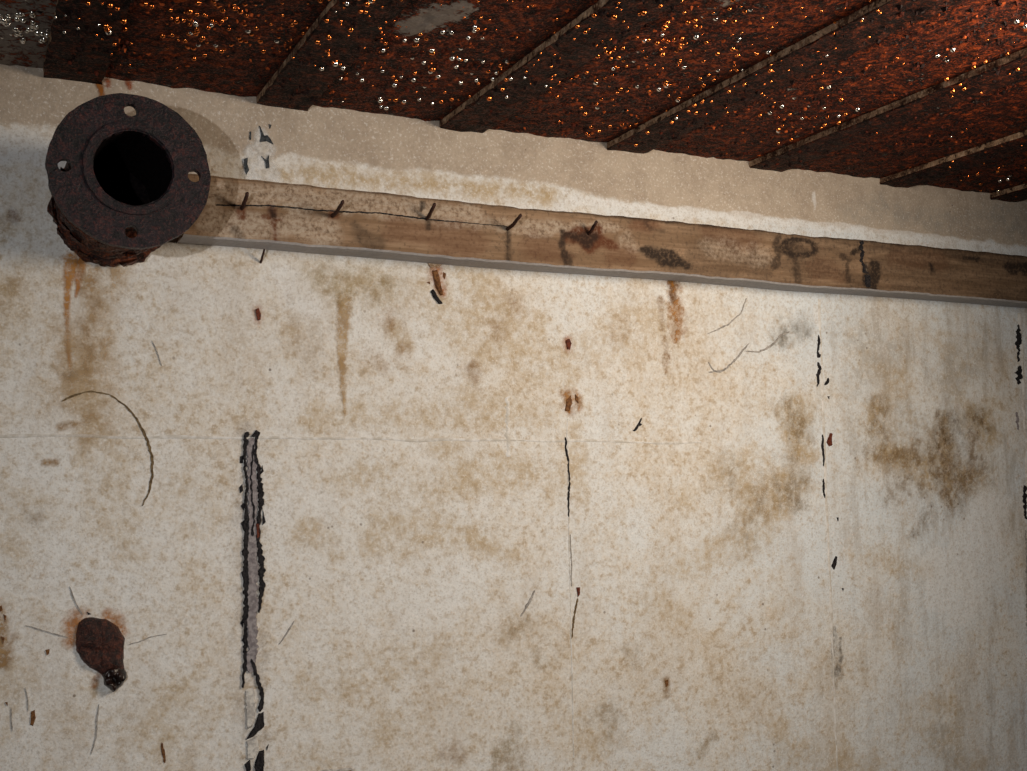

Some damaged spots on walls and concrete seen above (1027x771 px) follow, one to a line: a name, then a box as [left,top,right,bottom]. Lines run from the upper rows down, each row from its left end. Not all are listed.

rust [64,253,110,398]
rust [661,281,684,343]
crack [816,335,830,399]
crack [1014,324,1023,385]
crack [821,433,839,521]
crack [239,430,269,771]
crack [831,556,844,590]
crack [1019,485,1027,632]